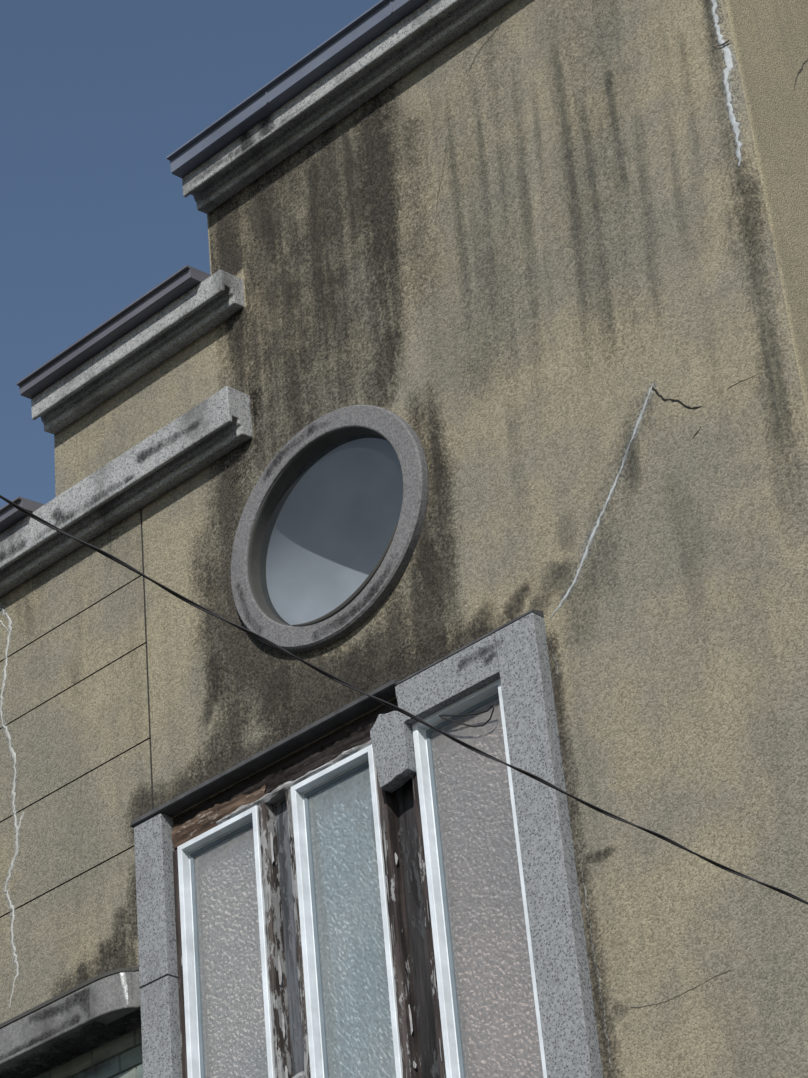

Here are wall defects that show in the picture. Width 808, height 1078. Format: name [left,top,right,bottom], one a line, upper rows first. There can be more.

crack [711,0,742,167]
leakage [196,82,455,767]
crack [551,387,702,617]
leakage [505,584,543,618]
crack [0,607,24,1008]
peeling [261,833,274,945]
spalling [171,699,417,871]
peeling [383,817,398,899]
peeling [273,1009,288,1078]